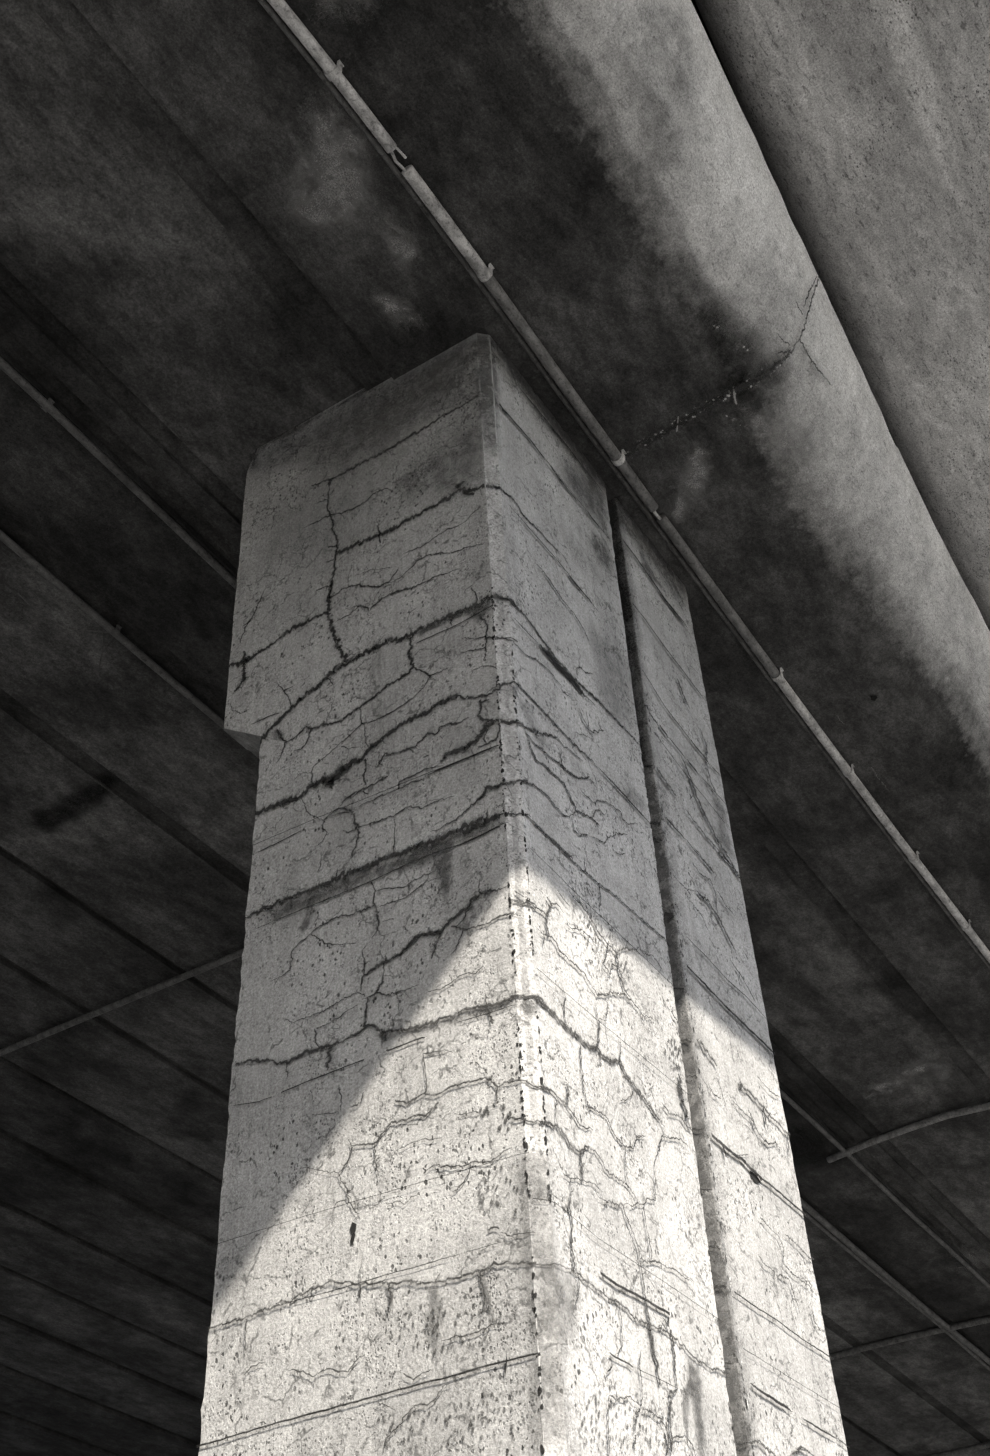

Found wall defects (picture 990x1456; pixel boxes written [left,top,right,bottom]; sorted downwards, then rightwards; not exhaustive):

crack [624,270,831,457]
crack [208,394,790,1456]
crack [758,1217,821,1331]
crack [735,1439,814,1456]